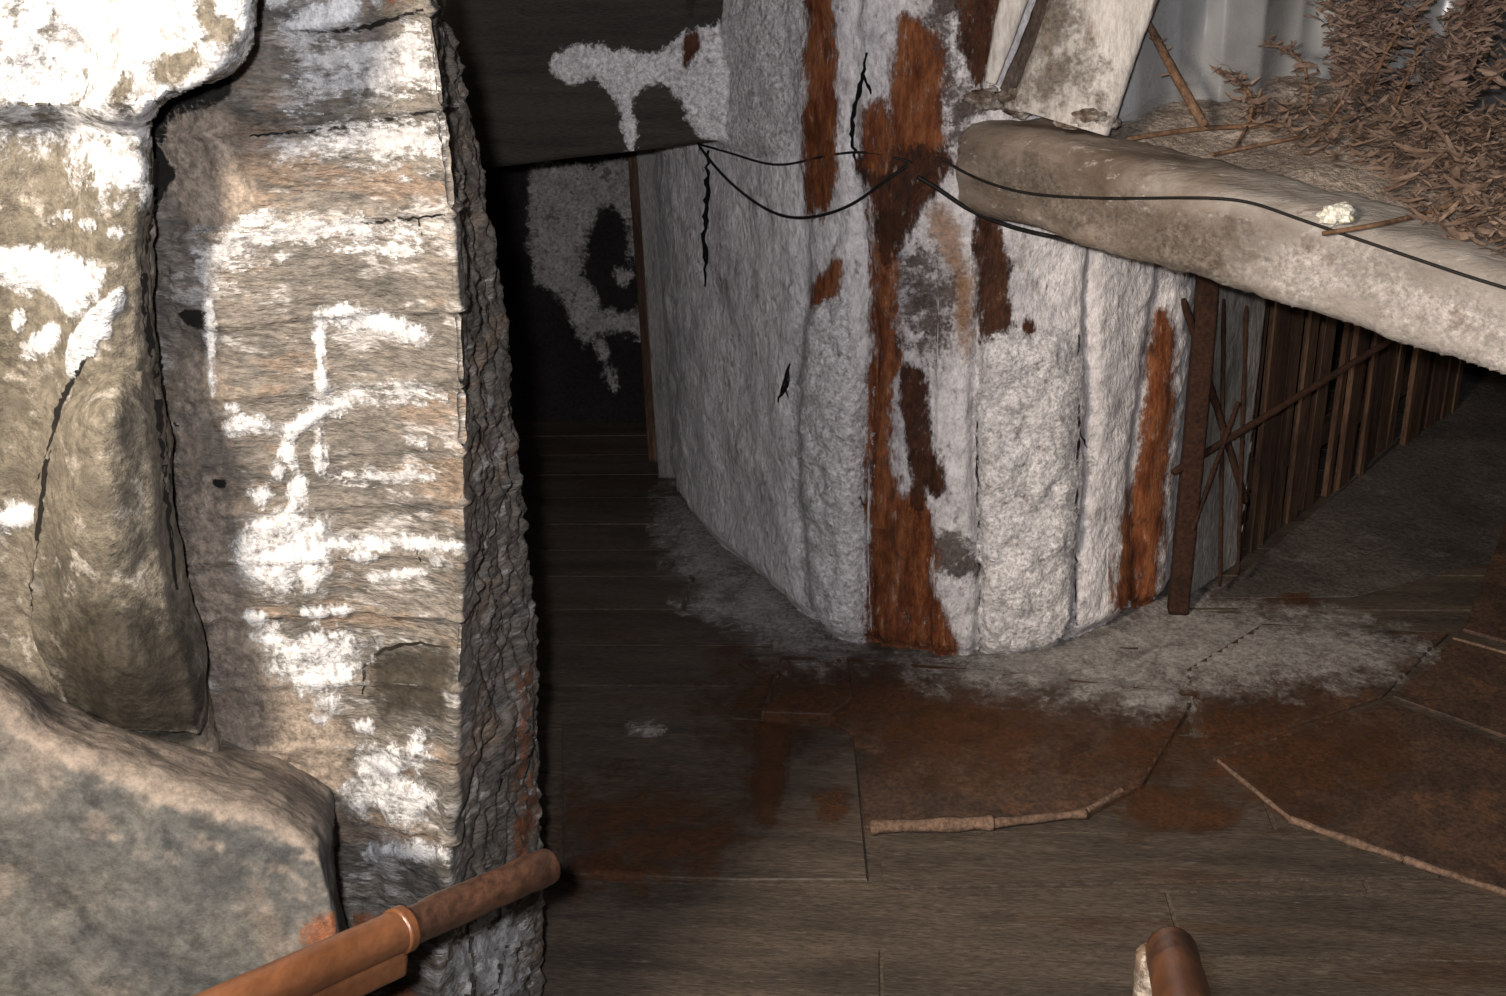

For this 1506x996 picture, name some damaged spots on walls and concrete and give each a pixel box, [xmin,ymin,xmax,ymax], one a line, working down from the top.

efflorescence [0,243,105,361]
efflorescence [0,0,454,240]
efflorescence [190,206,466,864]
damp [525,0,805,392]
crack [701,150,711,287]
crack [849,52,872,160]
rust [800,0,1036,657]
rust [1108,308,1179,613]